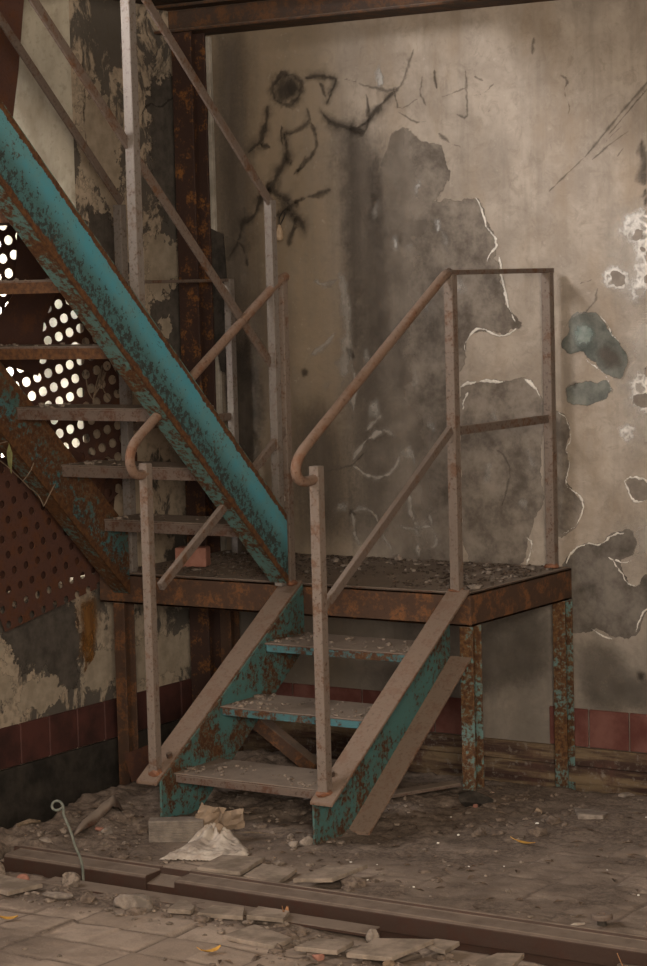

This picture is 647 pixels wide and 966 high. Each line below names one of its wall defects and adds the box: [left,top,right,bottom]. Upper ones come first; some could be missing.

rust [0,0,24,117]
rust [15,234,49,280]
damp [603,141,647,299]
rust [0,360,40,376]
rust [0,293,56,345]
peeling [387,128,521,561]
spalling [561,312,628,388]
damp [630,367,647,413]
rust [0,457,95,591]
peeling [460,377,544,565]
peeling [556,411,584,538]
peeling [563,529,647,639]